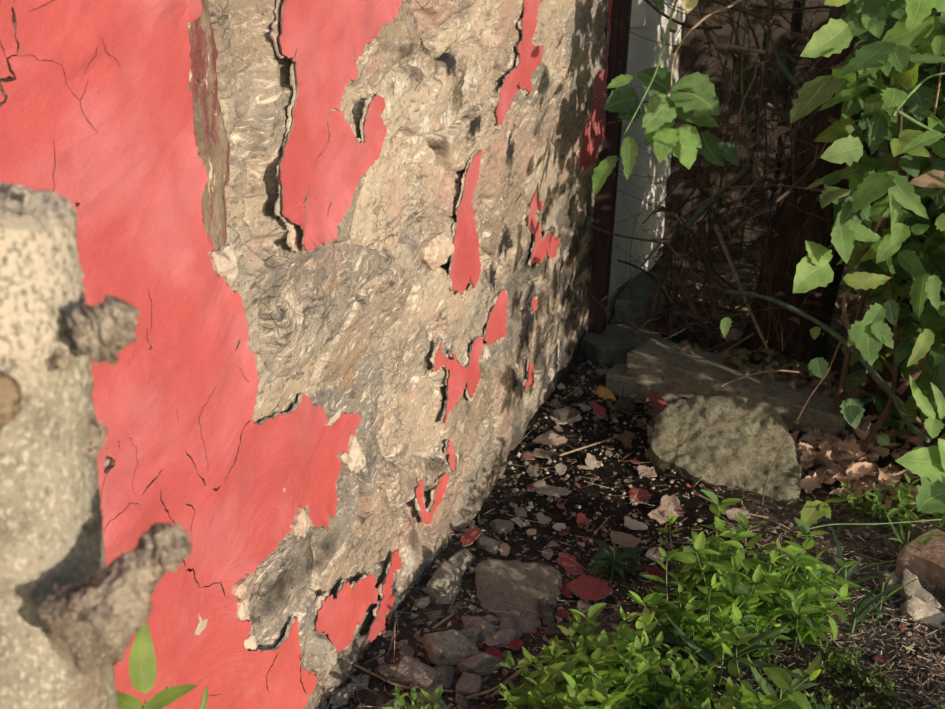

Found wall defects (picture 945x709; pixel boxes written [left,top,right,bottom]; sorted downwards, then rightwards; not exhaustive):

crack [0,39,121,133]
peeling [270,0,402,253]
peeling [492,0,544,127]
peeling [447,149,483,296]
peeling [526,190,561,266]
peeling [430,286,508,425]
crack [104,437,141,532]
peeling [415,440,457,526]
flaking render [531,406,582,474]
flaking render [585,453,600,470]
peeling [315,548,402,653]
peeling [557,552,613,613]